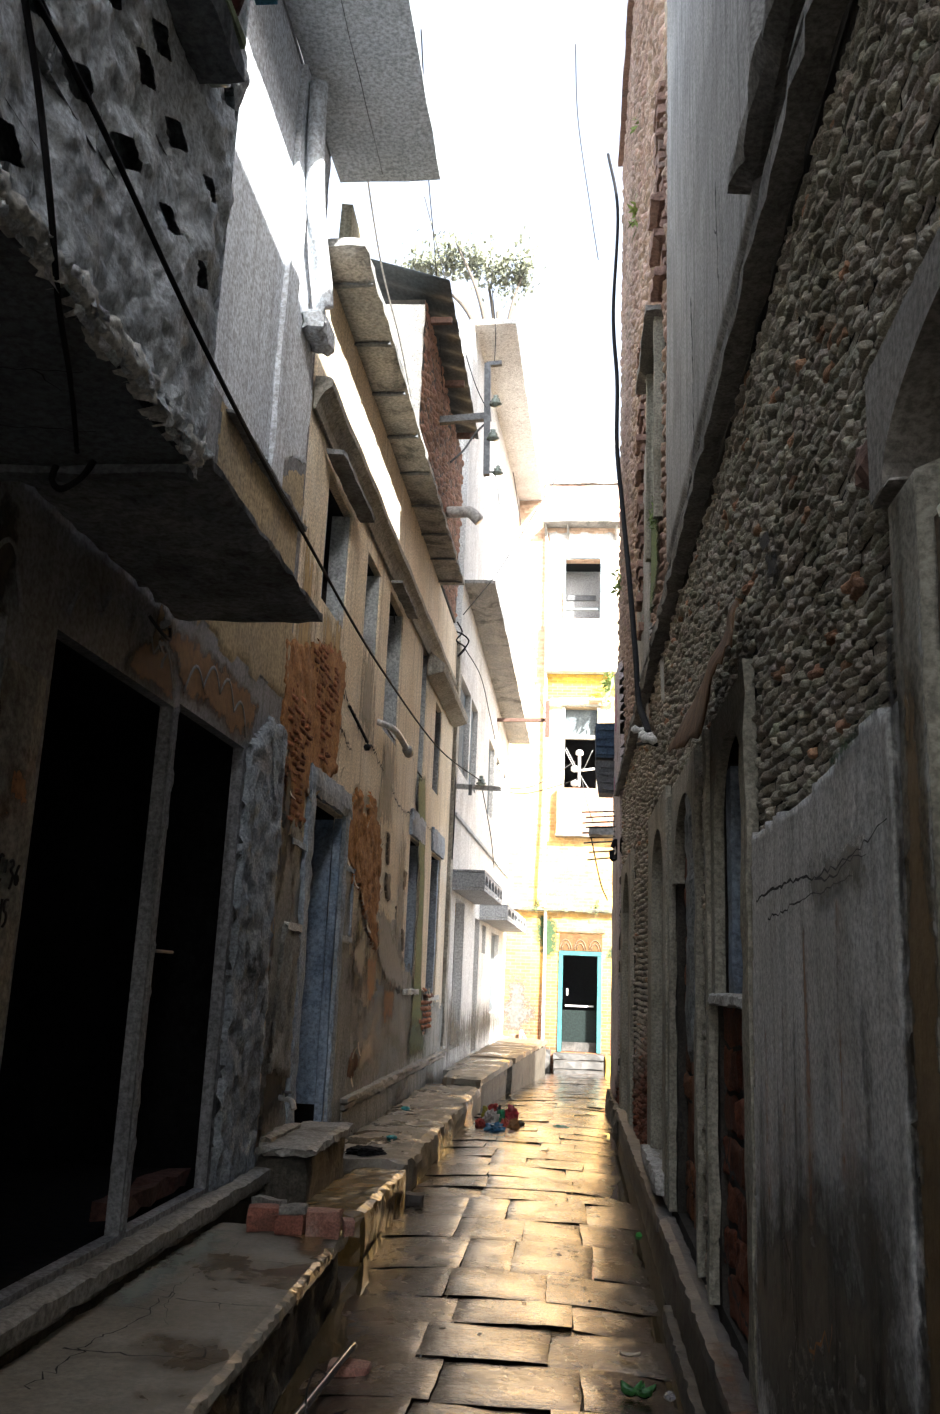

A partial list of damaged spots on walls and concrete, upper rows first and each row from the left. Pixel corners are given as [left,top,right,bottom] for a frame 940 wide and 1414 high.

peeling [126,603,259,740]
peeling [274,637,351,834]
peeling [347,787,407,985]
peeling [419,987,434,1036]
damp [753,671,940,1414]
crack [24,1243,271,1389]